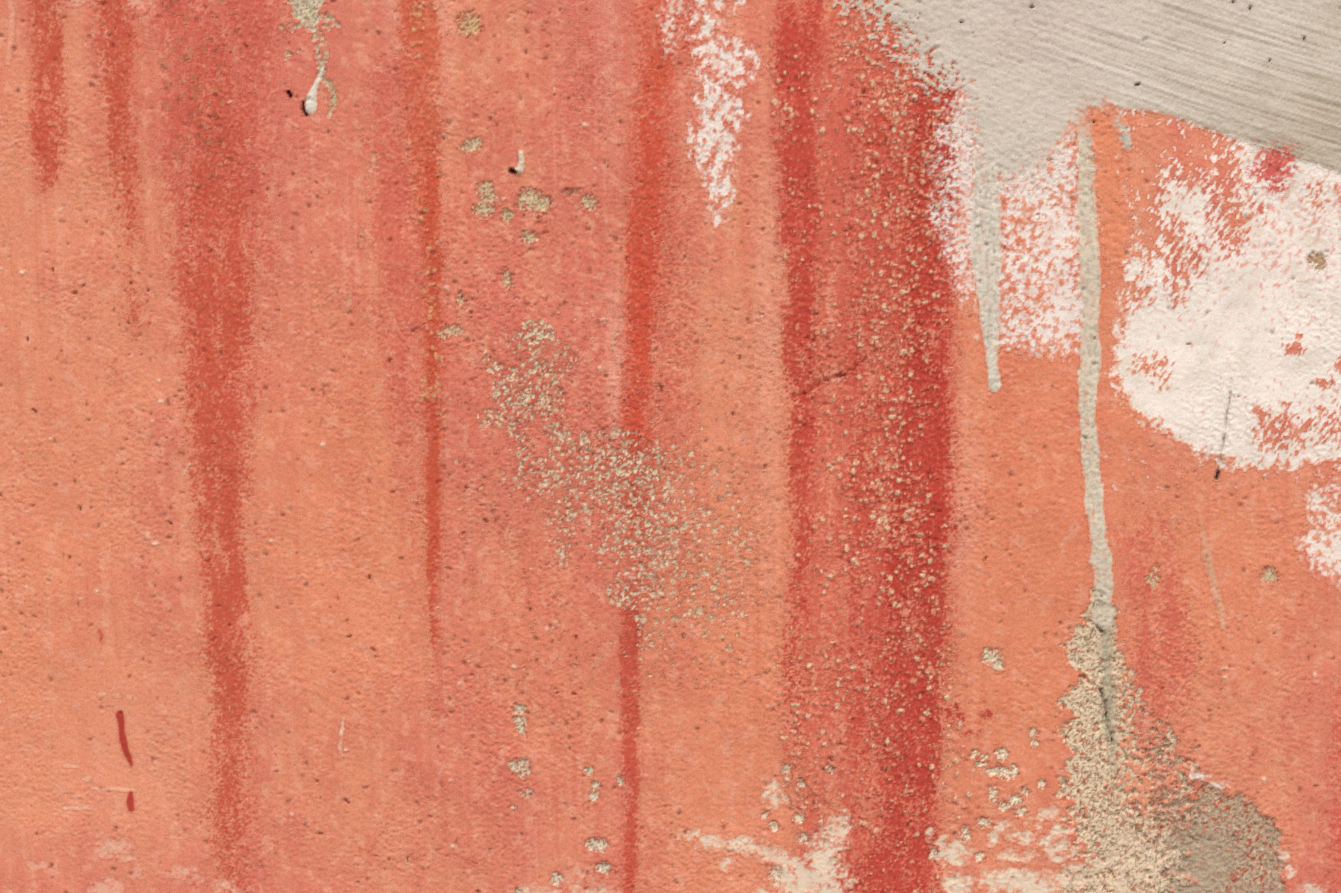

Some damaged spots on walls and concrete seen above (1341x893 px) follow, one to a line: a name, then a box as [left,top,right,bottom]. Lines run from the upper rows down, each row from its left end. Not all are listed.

leakage [89,0,293,893]
spalling [278,0,342,120]
leakage [616,609,646,893]
leakage [561,0,703,512]
leakage [766,0,969,893]
peeling [418,0,1341,893]